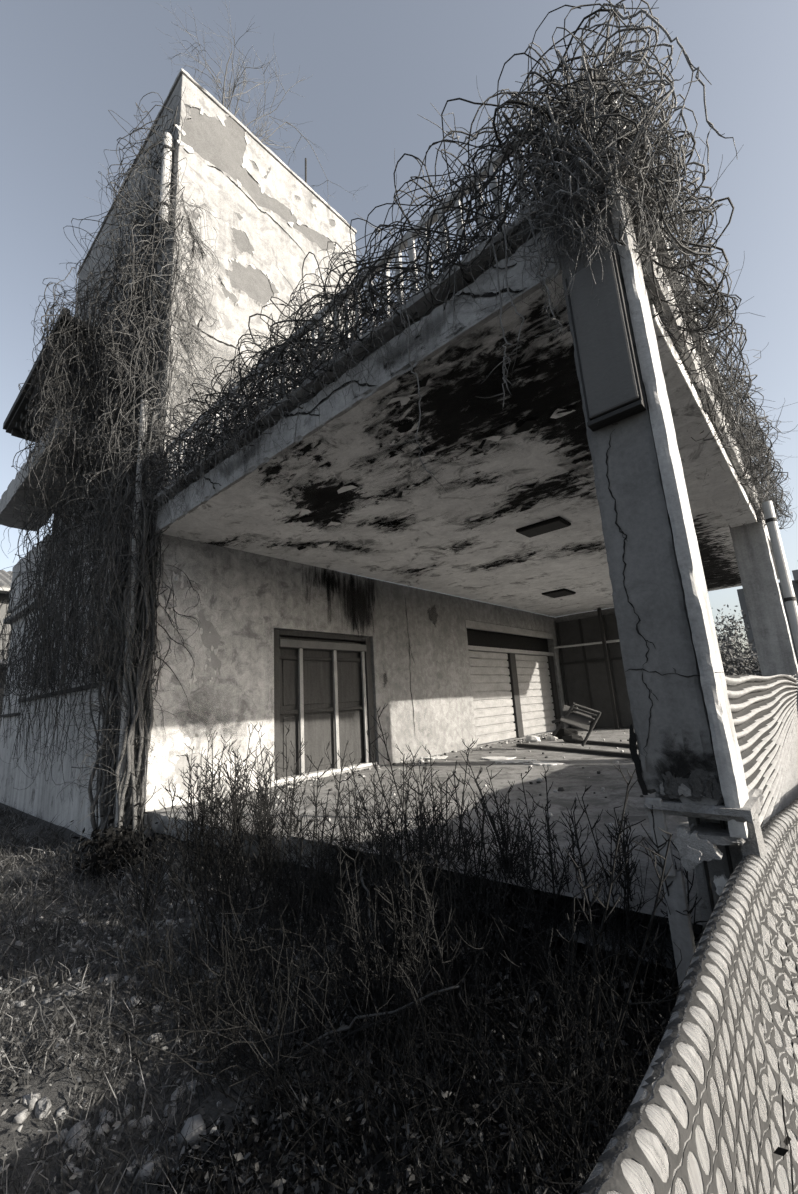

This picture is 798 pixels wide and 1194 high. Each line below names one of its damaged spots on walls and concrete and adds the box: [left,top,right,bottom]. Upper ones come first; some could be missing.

flaking render [176,103,338,254]
flaking render [216,211,281,311]
leakage [258,293,597,553]
leakage [307,567,375,630]
leakage [472,553,536,571]
leakage [558,542,606,556]
crack [606,424,728,758]
leakage [693,511,742,590]